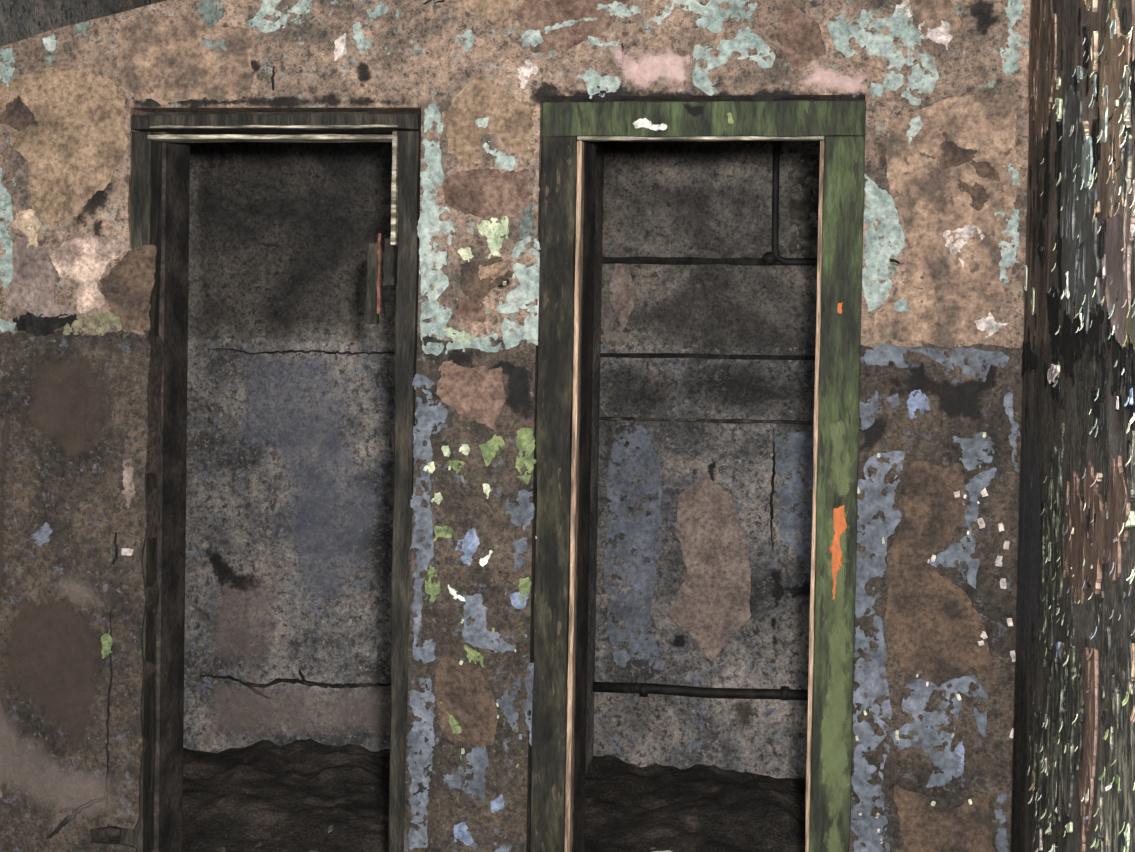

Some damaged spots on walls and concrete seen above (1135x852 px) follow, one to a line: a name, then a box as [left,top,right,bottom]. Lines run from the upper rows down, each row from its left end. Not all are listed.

peeling [334,1,389,61]
flaking render [0,0,313,337]
corrosion [829,505,847,599]
crack [199,669,391,699]